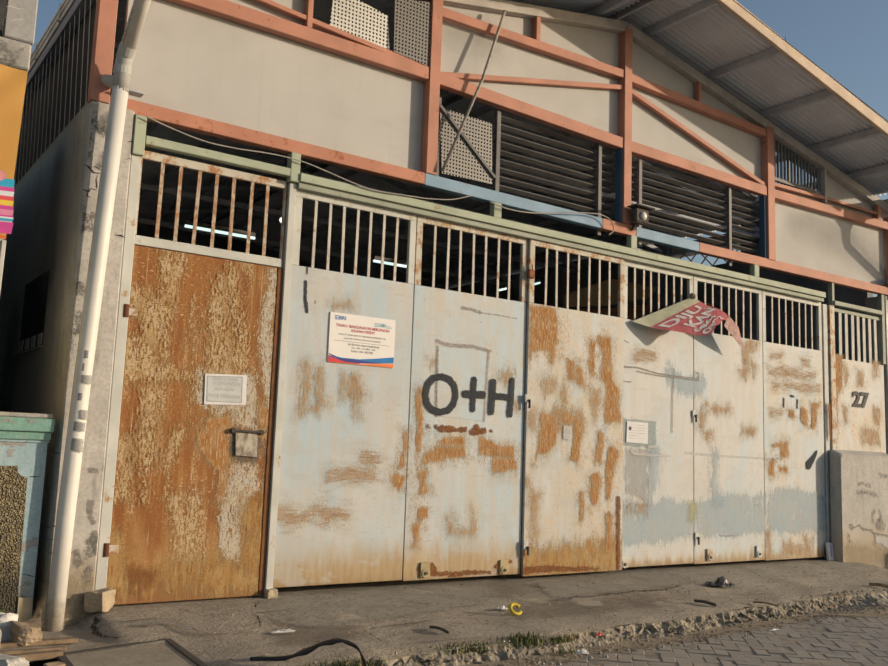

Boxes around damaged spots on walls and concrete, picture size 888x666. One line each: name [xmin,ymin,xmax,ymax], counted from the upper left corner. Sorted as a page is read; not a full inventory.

rust [297,360,328,417]
rust [738,339,760,382]
rust [768,352,881,440]
rust [196,413,235,505]
rust [326,450,382,485]
rust [389,386,518,550]
rust [515,304,648,576]
rust [767,441,789,477]
rust [860,406,882,446]
rust [277,504,350,527]
rust [107,493,263,599]
rust [417,559,512,577]